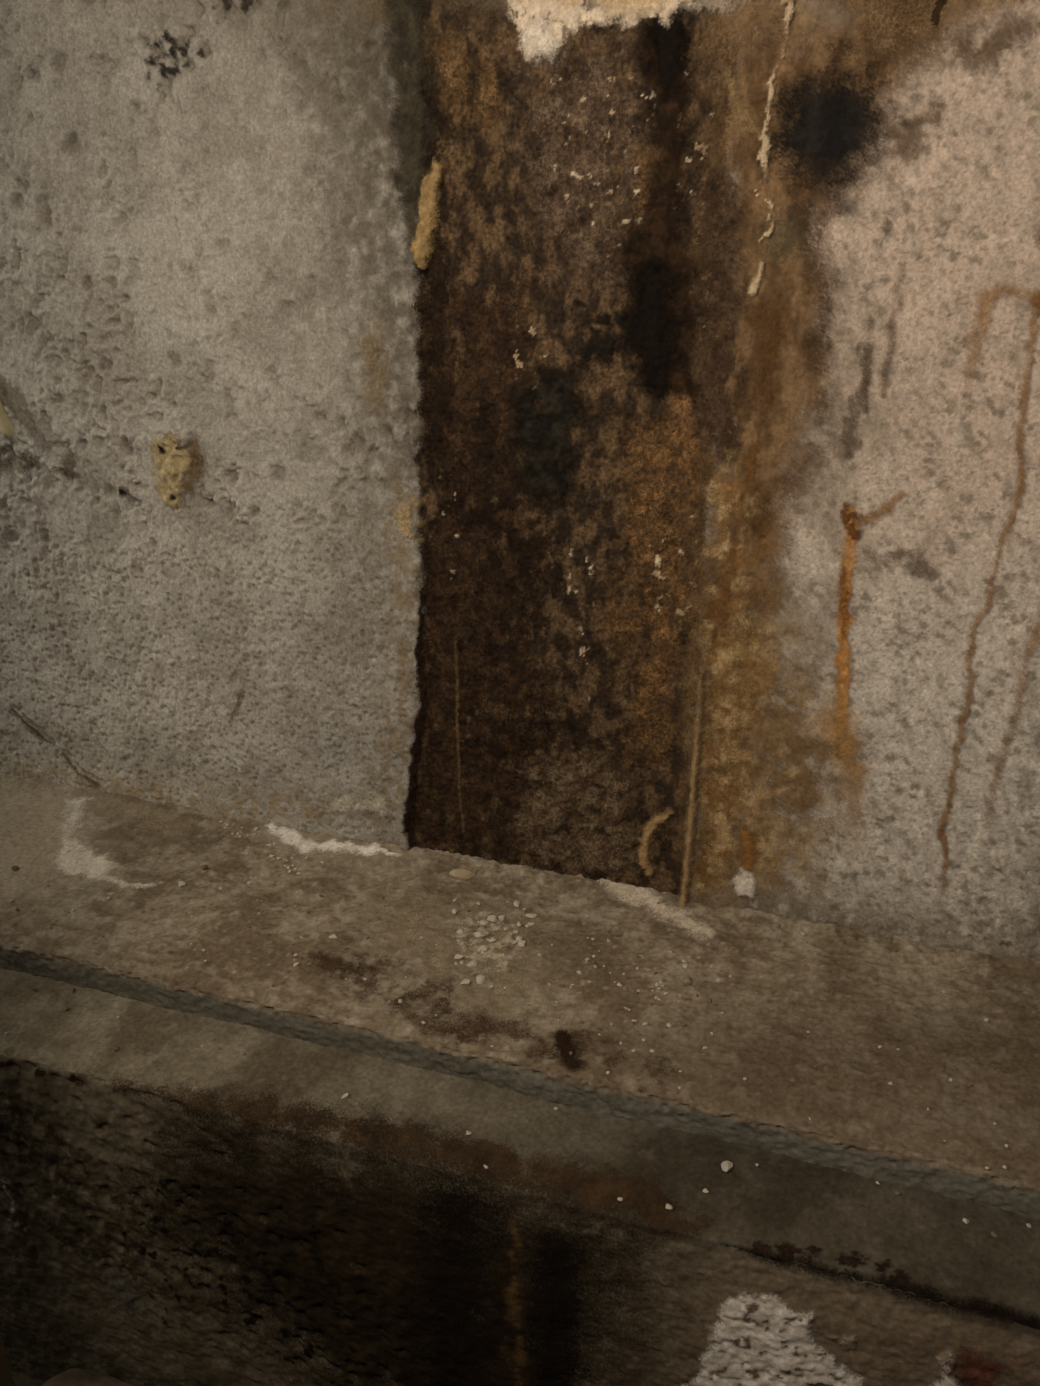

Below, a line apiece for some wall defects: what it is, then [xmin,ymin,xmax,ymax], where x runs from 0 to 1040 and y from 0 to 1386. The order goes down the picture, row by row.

leakage [52,791,194,889]
leakage [330,793,388,815]
spalling [402,0,736,897]
leakage [507,0,1040,941]
rust [690,445,904,898]
rust [937,283,1040,891]
leakage [125,1102,654,1386]